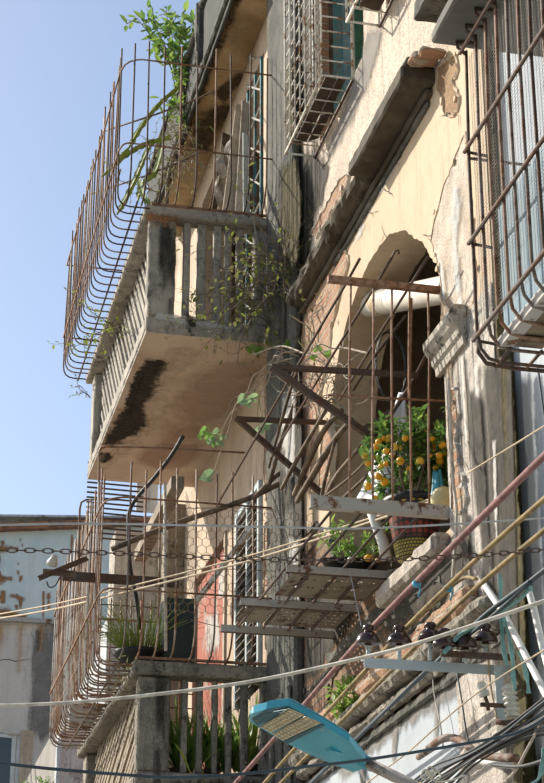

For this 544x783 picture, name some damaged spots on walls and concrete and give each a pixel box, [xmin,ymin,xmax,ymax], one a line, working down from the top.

water stain [170,0,250,183]
flaking render [434,52,461,118]
spalling [310,172,351,240]
flaking render [301,249,350,495]
water stain [100,360,169,463]
corrosion [0,571,26,617]
corrosion [39,591,50,647]